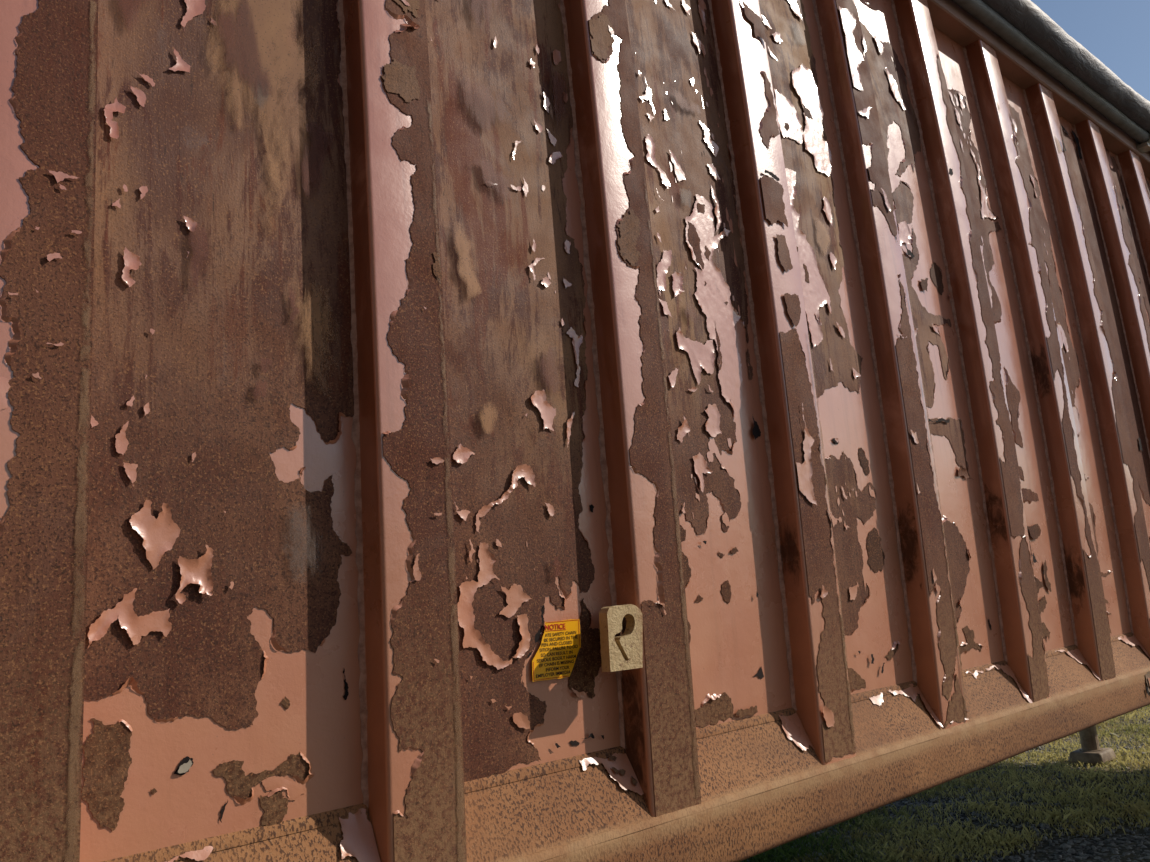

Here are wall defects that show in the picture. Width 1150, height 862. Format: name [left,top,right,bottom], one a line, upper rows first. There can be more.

peeling [0,0,354,862]
peeling [339,808,381,862]
peeling [381,0,602,862]
rust [621,673,644,781]
peeling [580,0,758,817]
peeling [742,0,1150,764]